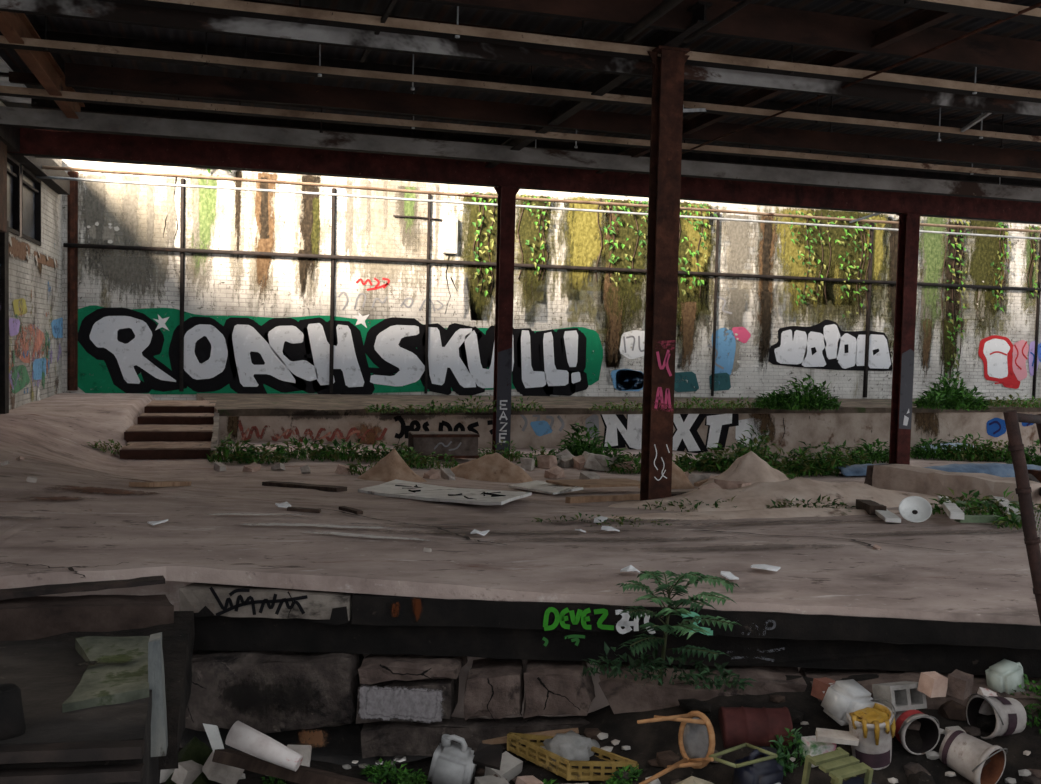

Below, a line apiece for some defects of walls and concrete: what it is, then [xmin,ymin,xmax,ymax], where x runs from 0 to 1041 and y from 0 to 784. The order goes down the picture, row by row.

water stain [63,173,217,308]
water stain [229,171,448,313]
water stain [516,195,552,294]
water stain [603,199,648,363]
water stain [677,203,796,369]
water stain [794,209,899,364]
water stain [915,220,1007,377]